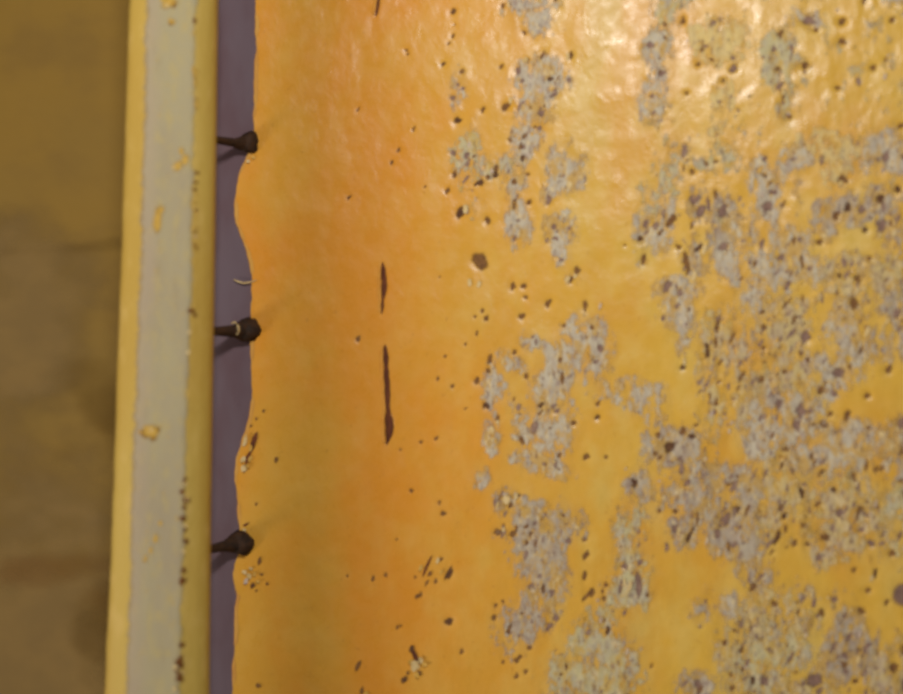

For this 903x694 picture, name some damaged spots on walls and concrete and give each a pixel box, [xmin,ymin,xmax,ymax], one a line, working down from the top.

peeling [445,51,588,267]
crack [376,262,387,314]
flaking render [210,0,269,694]
crack [379,345,394,445]
peeling [473,0,903,694]
spalling [414,556,453,599]
spalling [401,645,427,683]